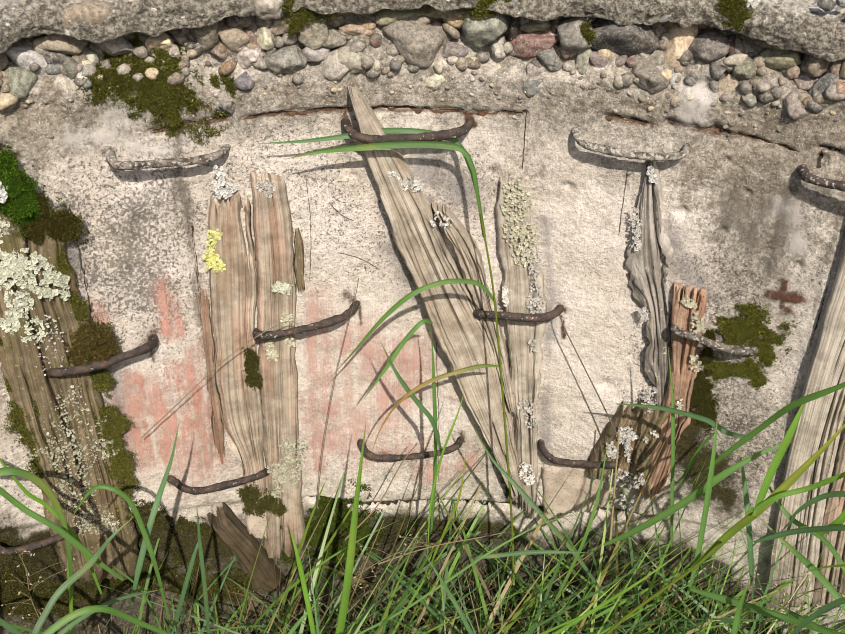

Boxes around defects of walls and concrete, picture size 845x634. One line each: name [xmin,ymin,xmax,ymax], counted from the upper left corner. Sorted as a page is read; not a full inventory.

rust [265,108,352,119]
crack [76,239,92,323]
rust [766,280,806,314]